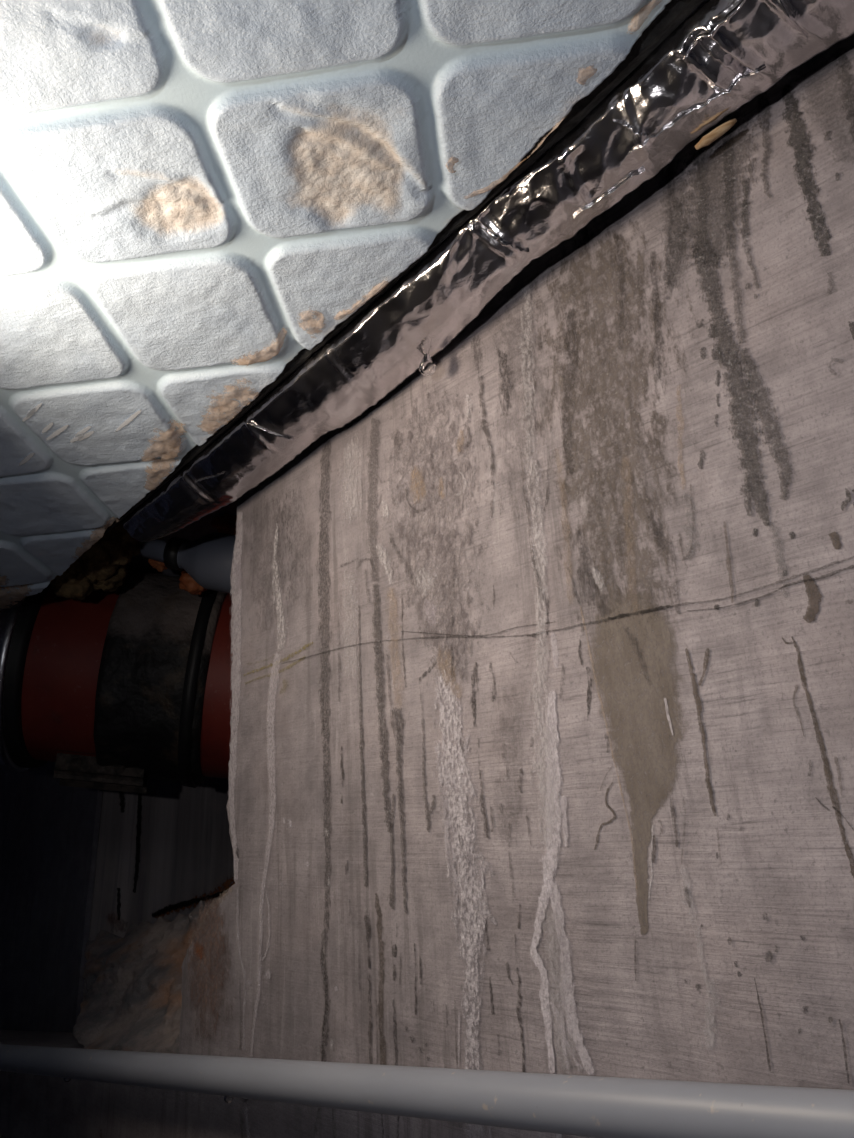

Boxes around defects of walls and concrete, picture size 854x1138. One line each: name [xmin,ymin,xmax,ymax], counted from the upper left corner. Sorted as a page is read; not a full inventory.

water stain [675,84,831,536]
water stain [499,225,716,1074]
crack [608,565,854,620]
spalling [72,896,224,1054]
water stain [419,663,497,1070]